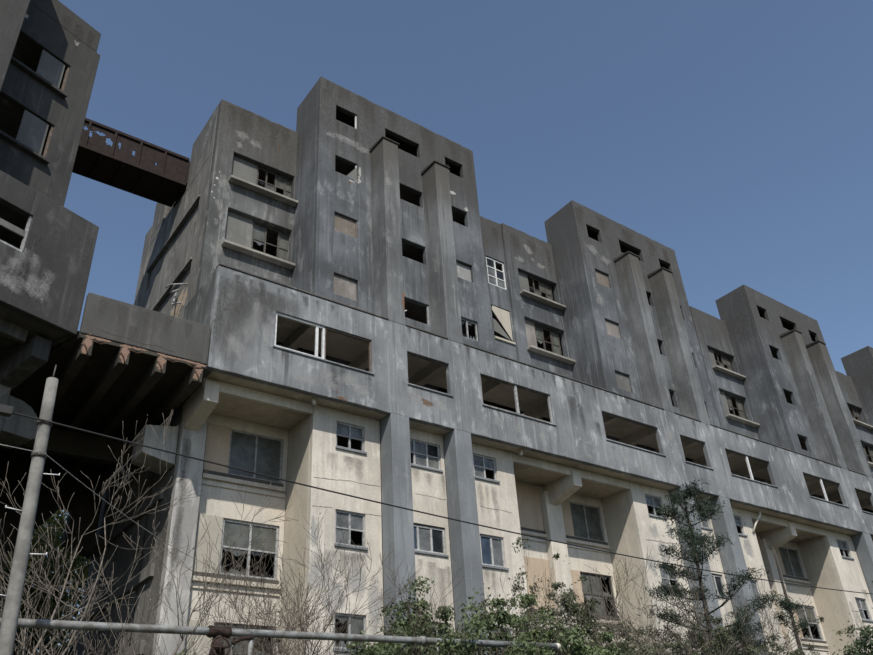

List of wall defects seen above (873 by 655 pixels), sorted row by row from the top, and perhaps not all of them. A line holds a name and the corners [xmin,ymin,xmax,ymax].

spalling [82,334,206,380]